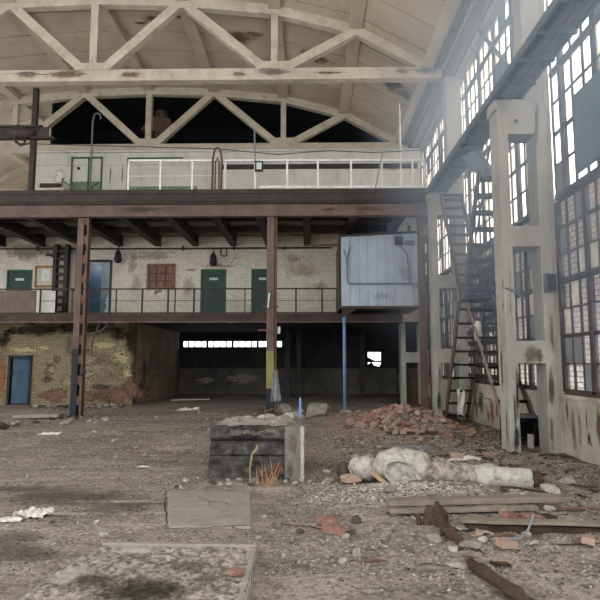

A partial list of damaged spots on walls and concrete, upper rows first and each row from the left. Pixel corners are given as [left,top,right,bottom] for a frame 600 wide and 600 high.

peeling [38,355,71,404]
peeling [84,341,142,404]
water stain [526,348,542,362]
water stain [566,405,587,444]